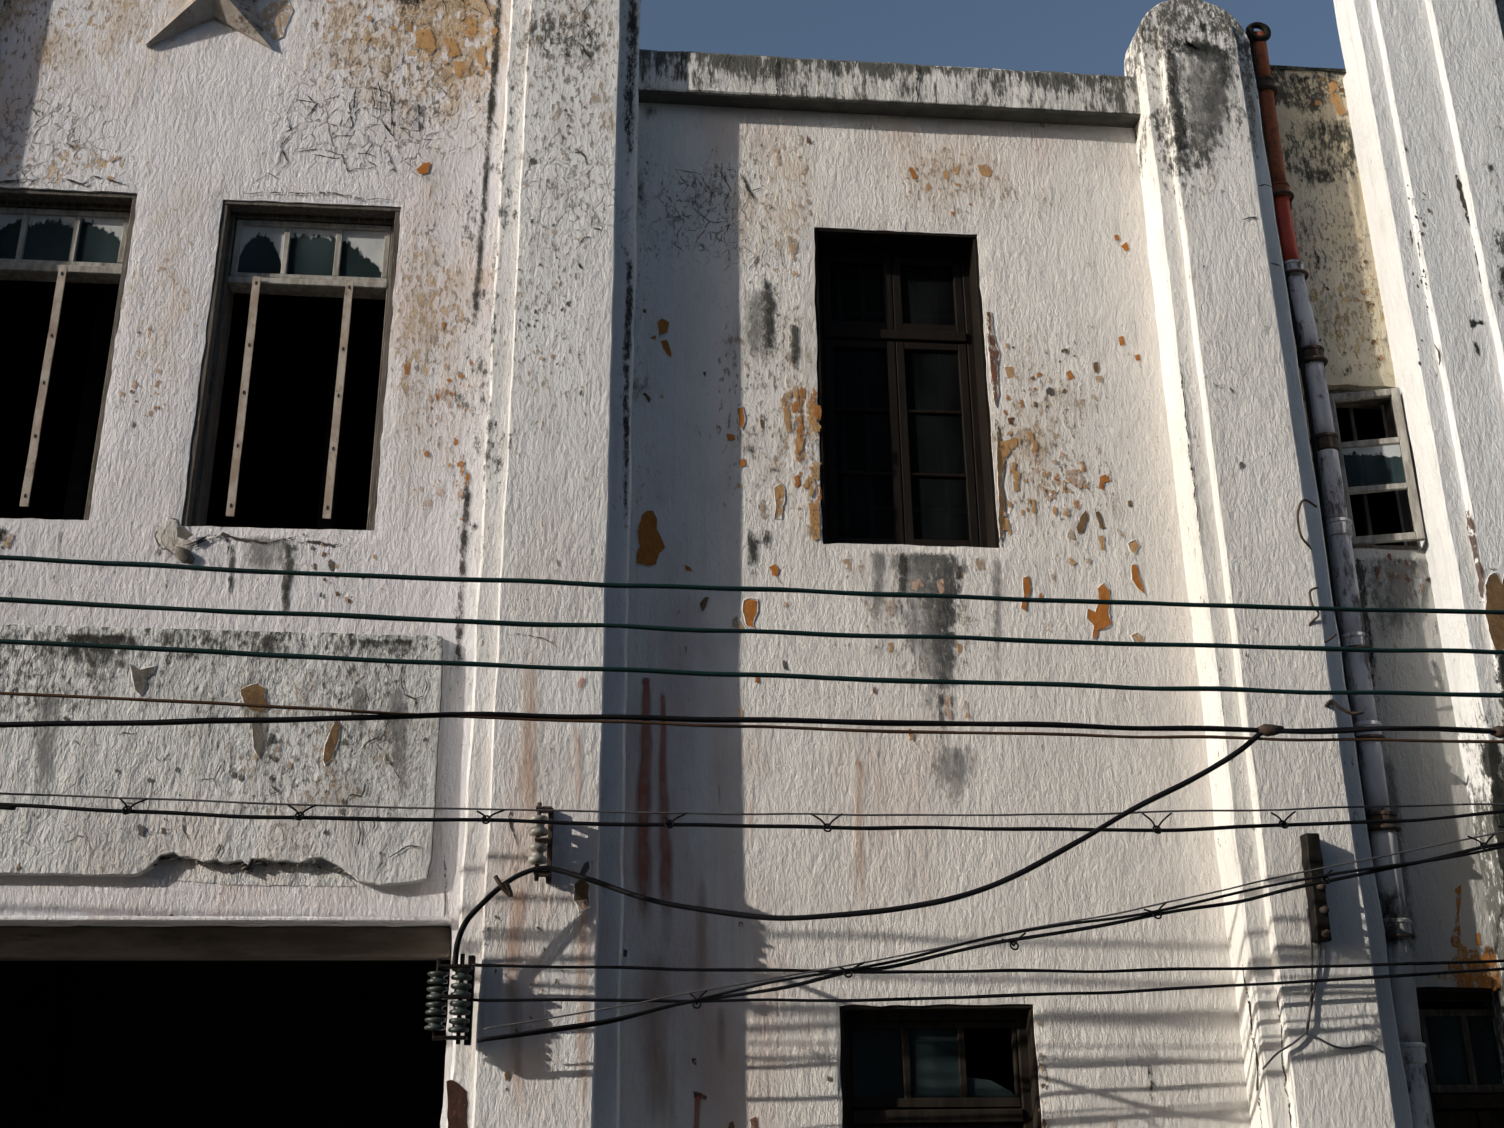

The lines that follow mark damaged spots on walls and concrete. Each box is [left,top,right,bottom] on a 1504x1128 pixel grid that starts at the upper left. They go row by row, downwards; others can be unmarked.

crack [0,98,126,185]
crack [244,82,448,200]
damp [1165,23,1258,186]
crack [674,167,784,279]
peeling [760,387,822,541]
peeling [986,311,1145,612]
damp [872,552,973,792]
peeling [1085,582,1112,640]
peeling [1466,510,1504,650]
damp [1492,647,1504,726]
corrosion [637,678,671,909]
damp [1480,743,1504,895]